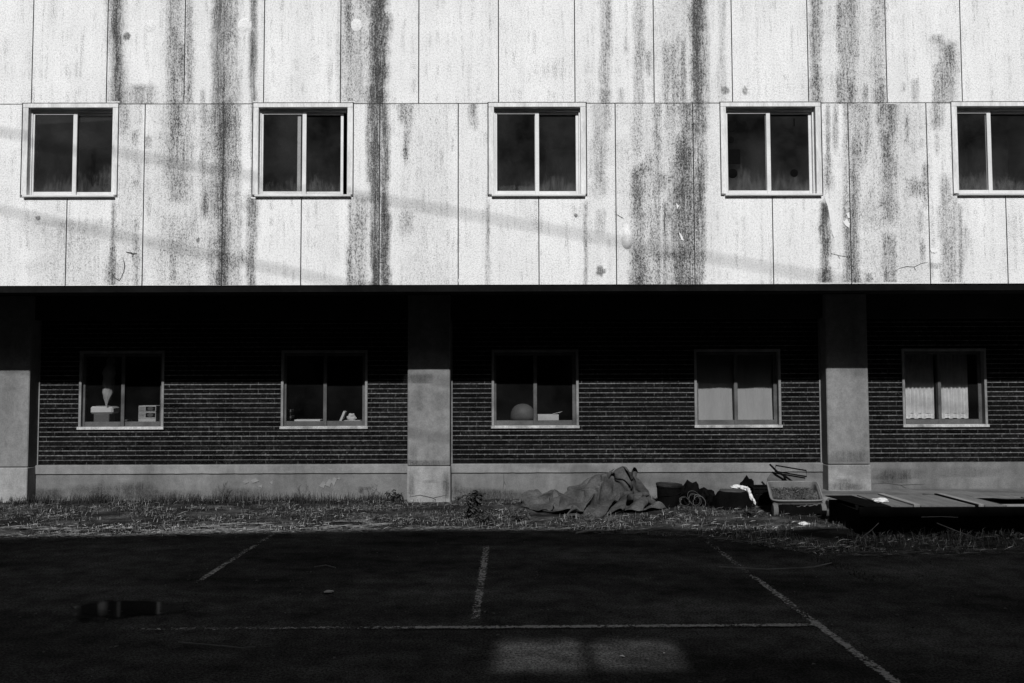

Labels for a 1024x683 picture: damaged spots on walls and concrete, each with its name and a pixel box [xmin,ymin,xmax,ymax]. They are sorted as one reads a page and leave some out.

damp [166,3,192,200]
damp [202,0,257,285]
damp [340,0,391,285]
damp [632,0,707,285]
damp [819,202,832,282]
damp [827,2,908,283]
damp [933,37,956,127]